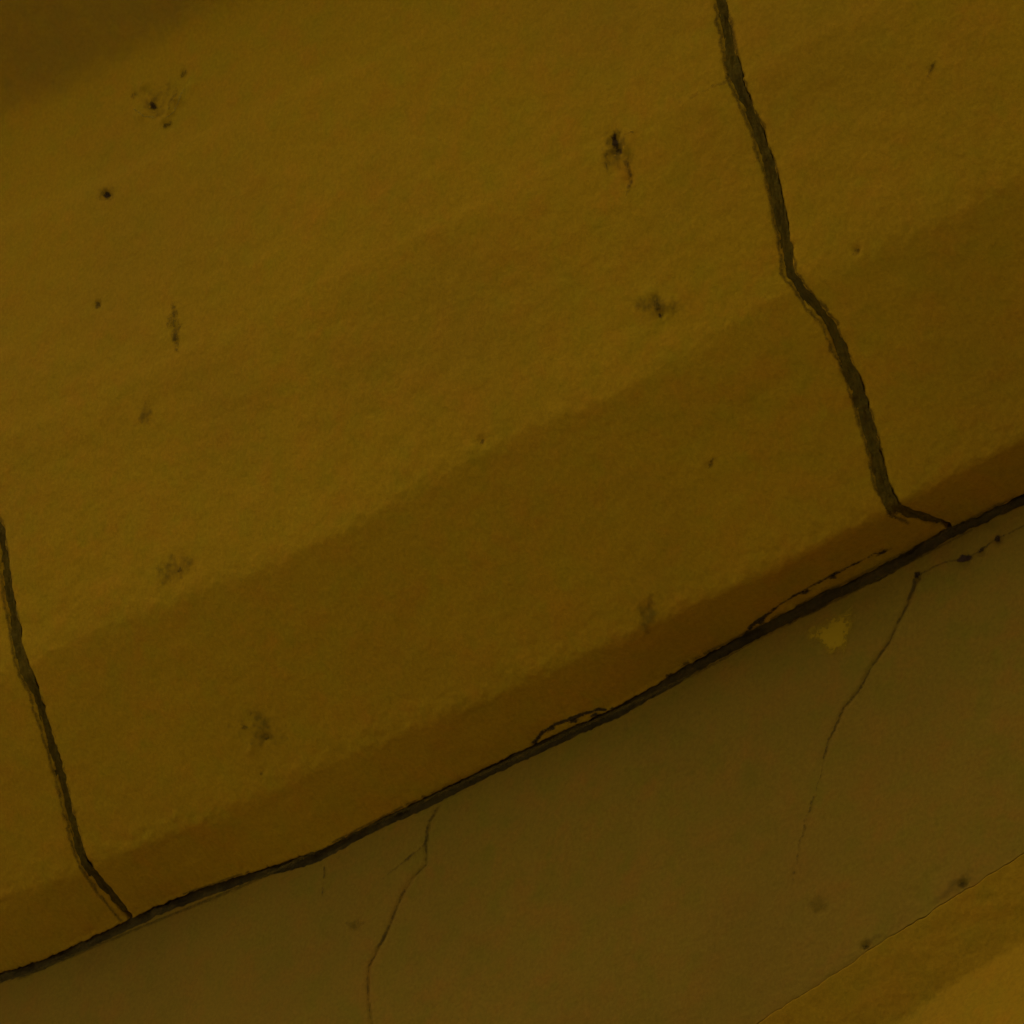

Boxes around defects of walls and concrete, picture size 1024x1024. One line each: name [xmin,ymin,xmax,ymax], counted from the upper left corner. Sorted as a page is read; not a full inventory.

crack [714,0,943,524]
crack [0,494,1024,983]